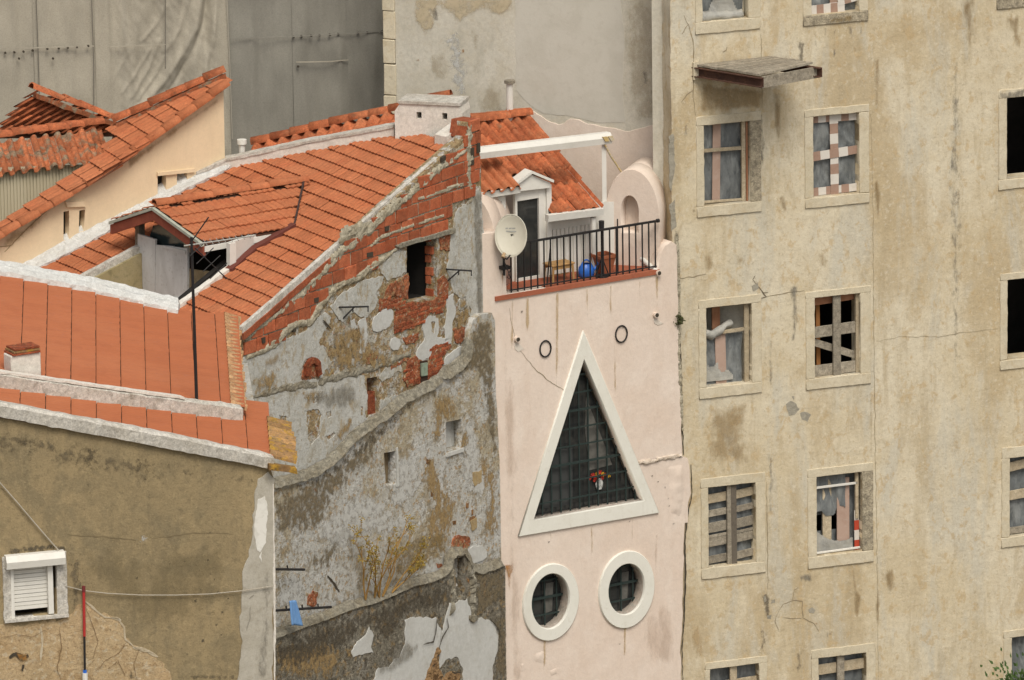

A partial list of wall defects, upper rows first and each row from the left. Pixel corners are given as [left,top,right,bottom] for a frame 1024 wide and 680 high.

leakage [0,437,146,473]
flaking render [242,118,484,680]
crack [766,482,819,631]
flaking render [0,601,172,680]